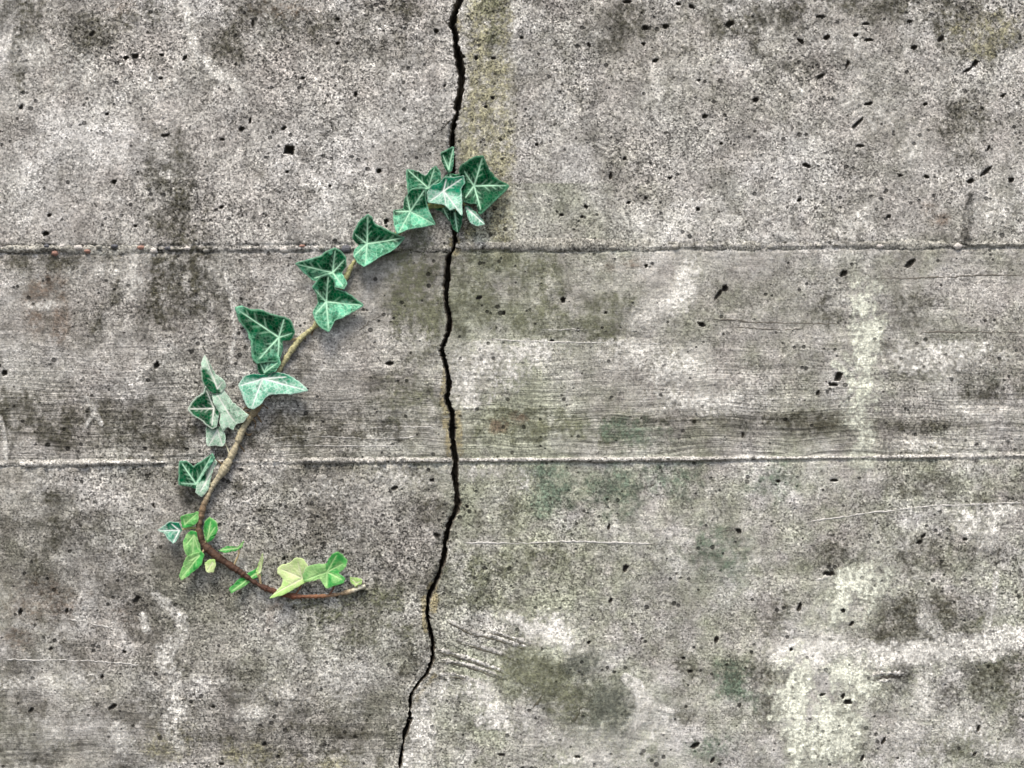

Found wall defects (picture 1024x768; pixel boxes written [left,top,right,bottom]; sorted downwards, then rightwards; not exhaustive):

crack [444,0,466,174]
crack [279,210,661,768]